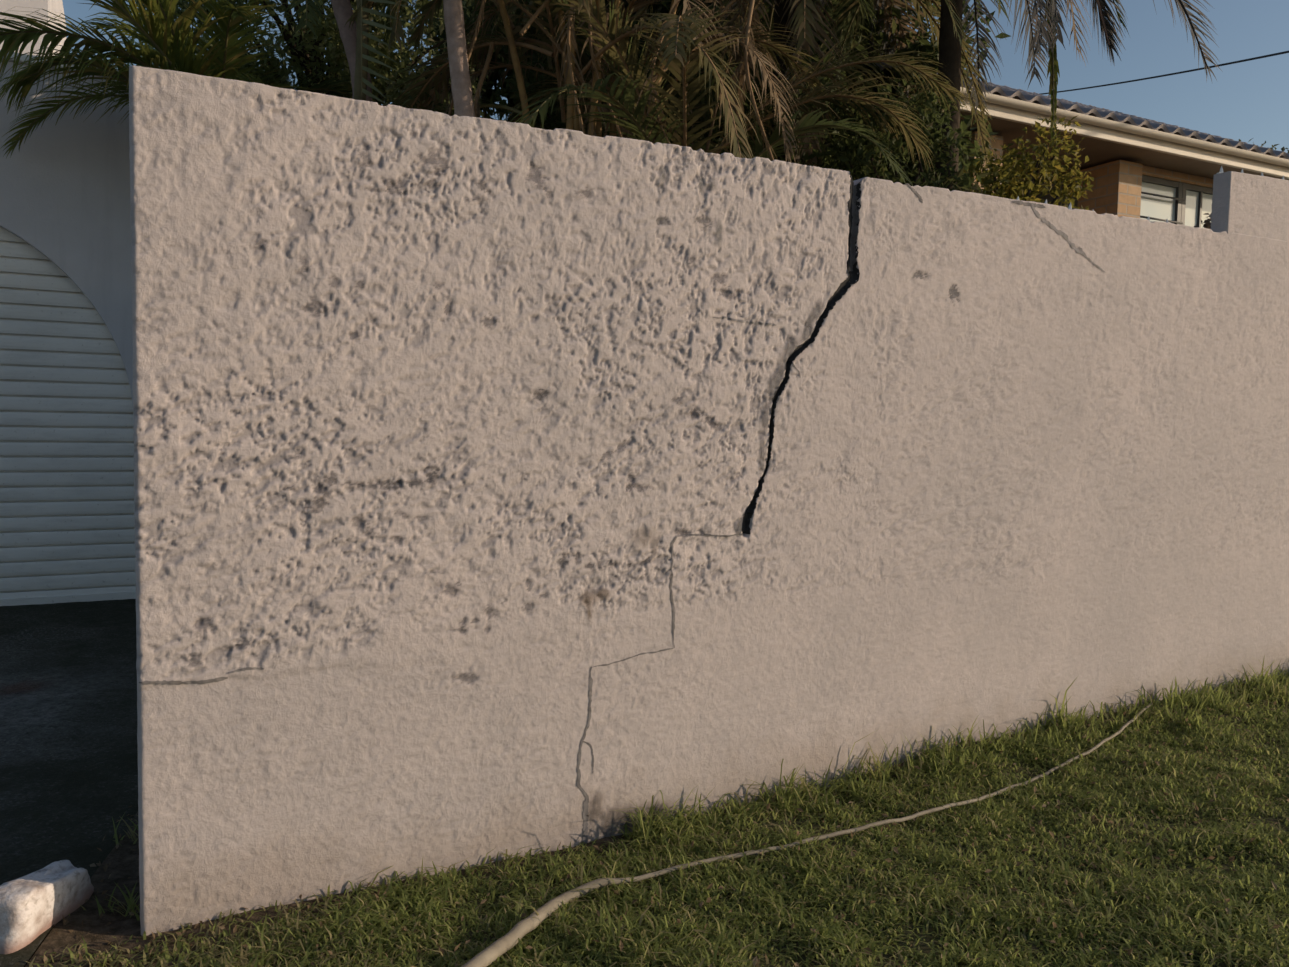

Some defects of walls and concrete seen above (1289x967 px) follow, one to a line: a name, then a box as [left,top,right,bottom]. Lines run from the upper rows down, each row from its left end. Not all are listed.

crack [577,172,861,844]
crack [1012,200,1105,272]